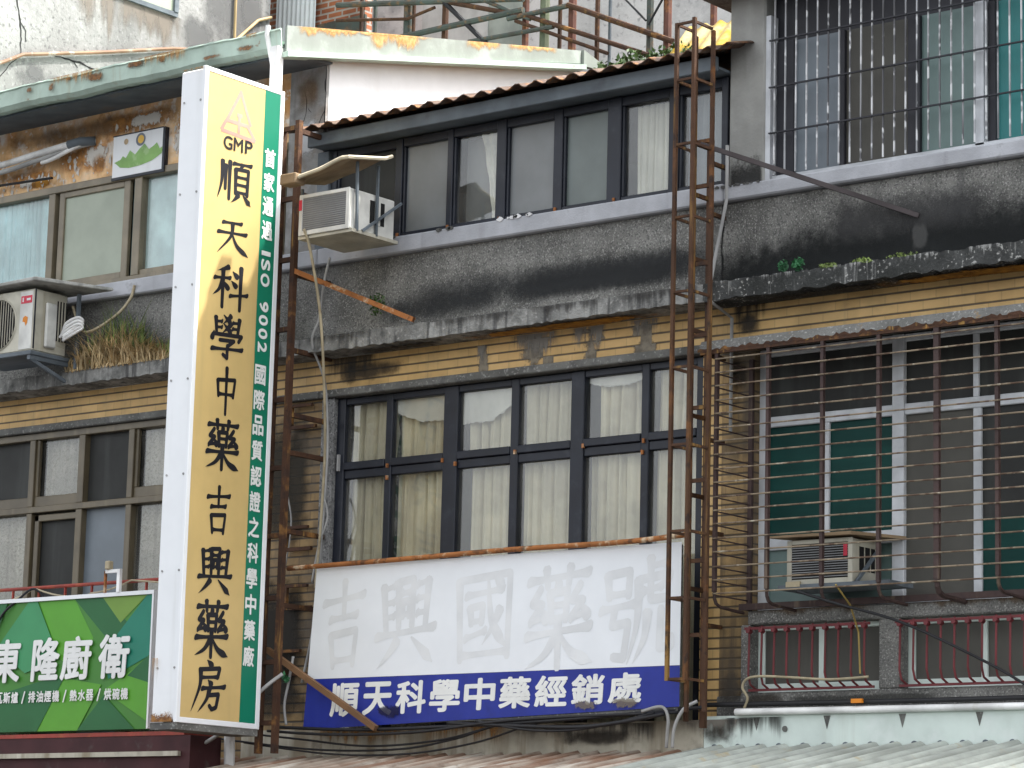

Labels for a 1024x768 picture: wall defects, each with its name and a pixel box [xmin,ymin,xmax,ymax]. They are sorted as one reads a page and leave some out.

corrosion [127,48,183,68]
corrosion [303,27,423,48]
corrosion [469,41,554,52]
corrosion [49,69,102,90]
peeling [2,110,180,197]
water stain [730,163,761,185]
water stain [715,195,1024,284]
water stain [393,252,689,338]
water stain [736,285,874,332]
water stain [332,342,437,382]
water stain [733,363,746,387]
corrosion [151,712,172,722]